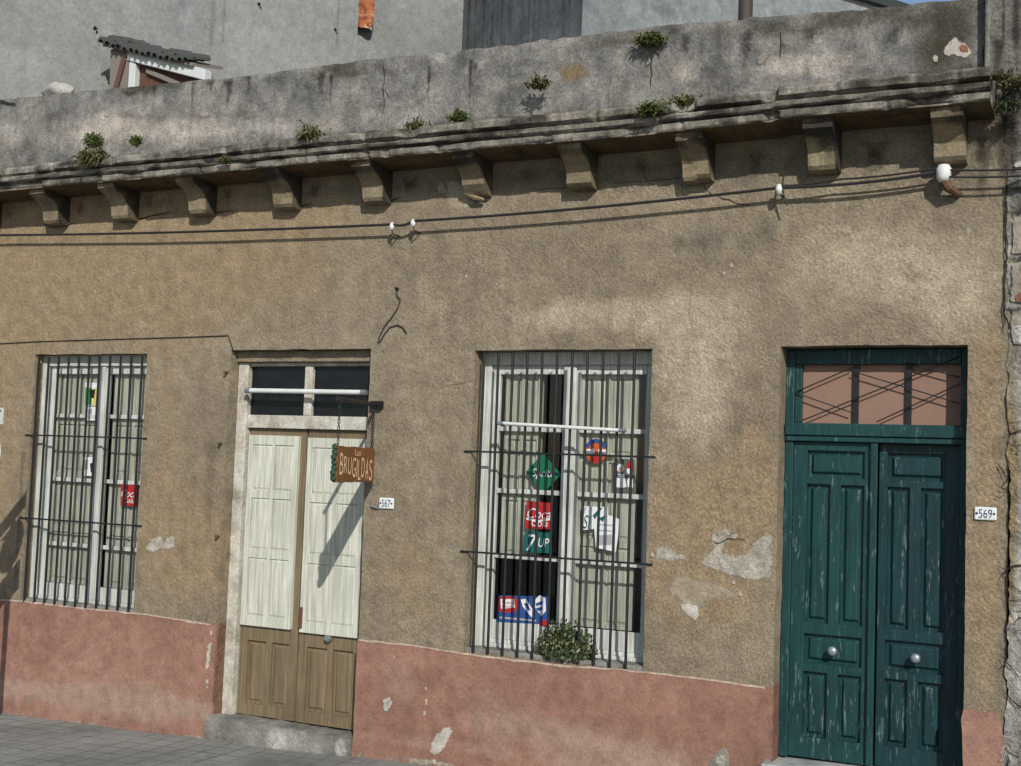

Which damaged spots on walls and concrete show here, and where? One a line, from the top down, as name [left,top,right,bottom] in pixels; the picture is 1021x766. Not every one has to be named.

spalling [933,37,971,62]
peeling [1010,216,1021,344]
peeling [147,536,175,552]
peeling [651,527,774,620]
spalling [339,727,455,766]
spalling [709,748,730,766]